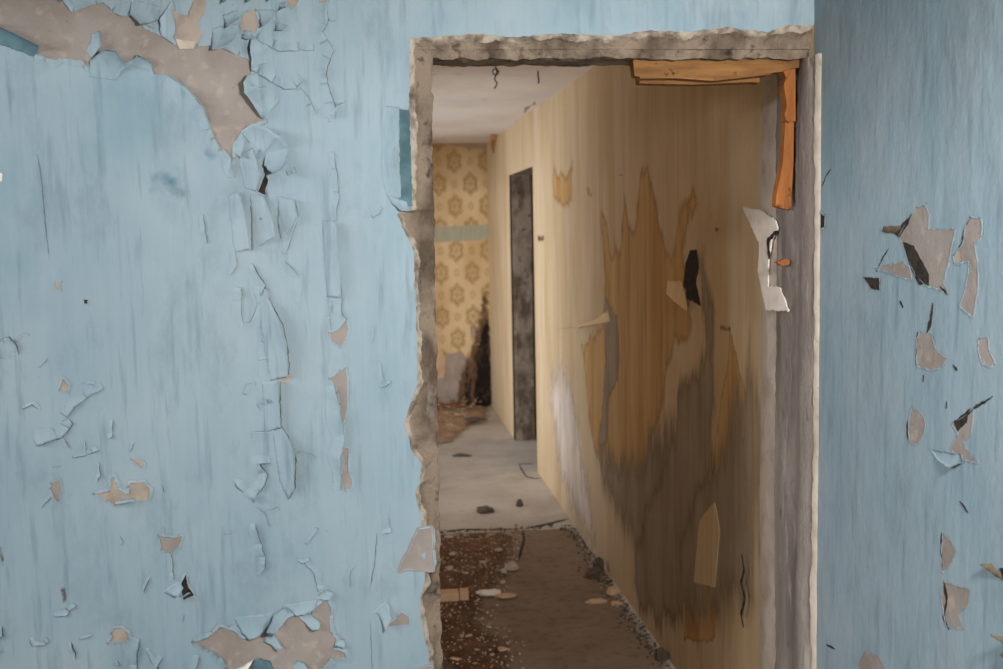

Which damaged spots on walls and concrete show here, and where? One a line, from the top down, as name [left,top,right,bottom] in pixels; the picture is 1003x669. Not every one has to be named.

peeling [0,0,301,197]
peeling [322,152,351,349]
peeling [863,204,984,318]
damp [458,292,492,407]
spalling [373,24,835,669]
peeling [915,303,957,382]
peeling [91,456,164,508]
peeling [287,364,356,500]
peeling [930,396,993,468]
peeling [191,589,352,669]
peeling [940,533,971,630]
peeling [980,564,1003,581]